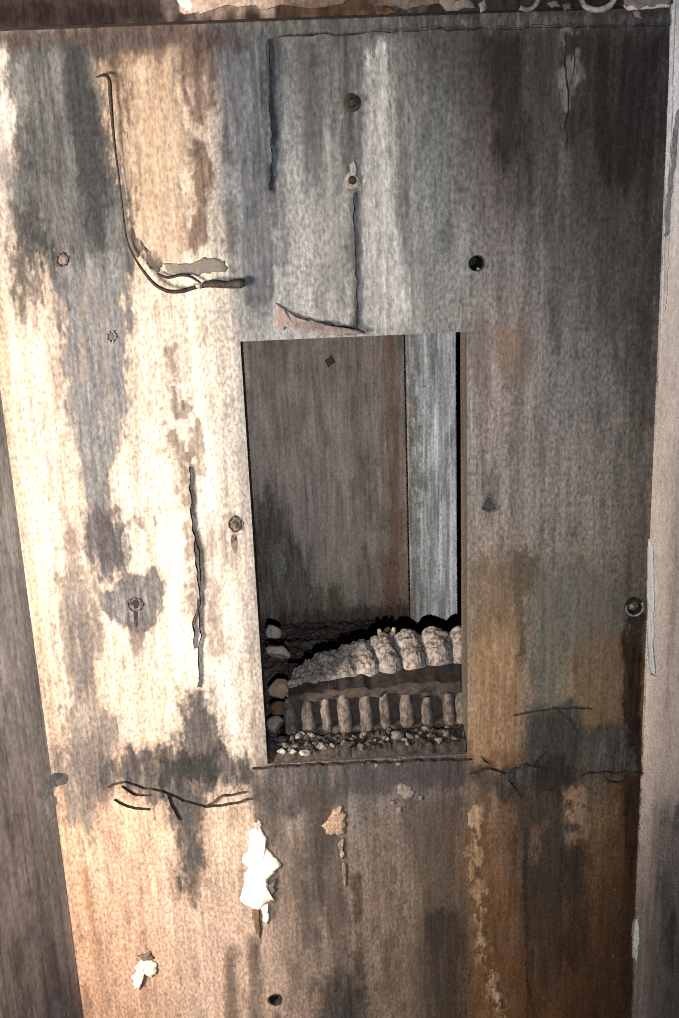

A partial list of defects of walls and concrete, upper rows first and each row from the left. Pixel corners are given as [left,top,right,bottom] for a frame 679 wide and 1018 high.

spalling [120,54,228,276]
leakage [179,0,592,369]
crack [268,23,670,191]
leakage [0,32,463,953]
crack [189,469,202,688]
flaking render [131,951,158,989]
flaking render [240,820,282,938]
crack [106,751,550,821]
flaking render [321,804,347,886]
leakage [311,875,367,1018]
crack [513,706,593,729]
leakage [470,700,639,1007]